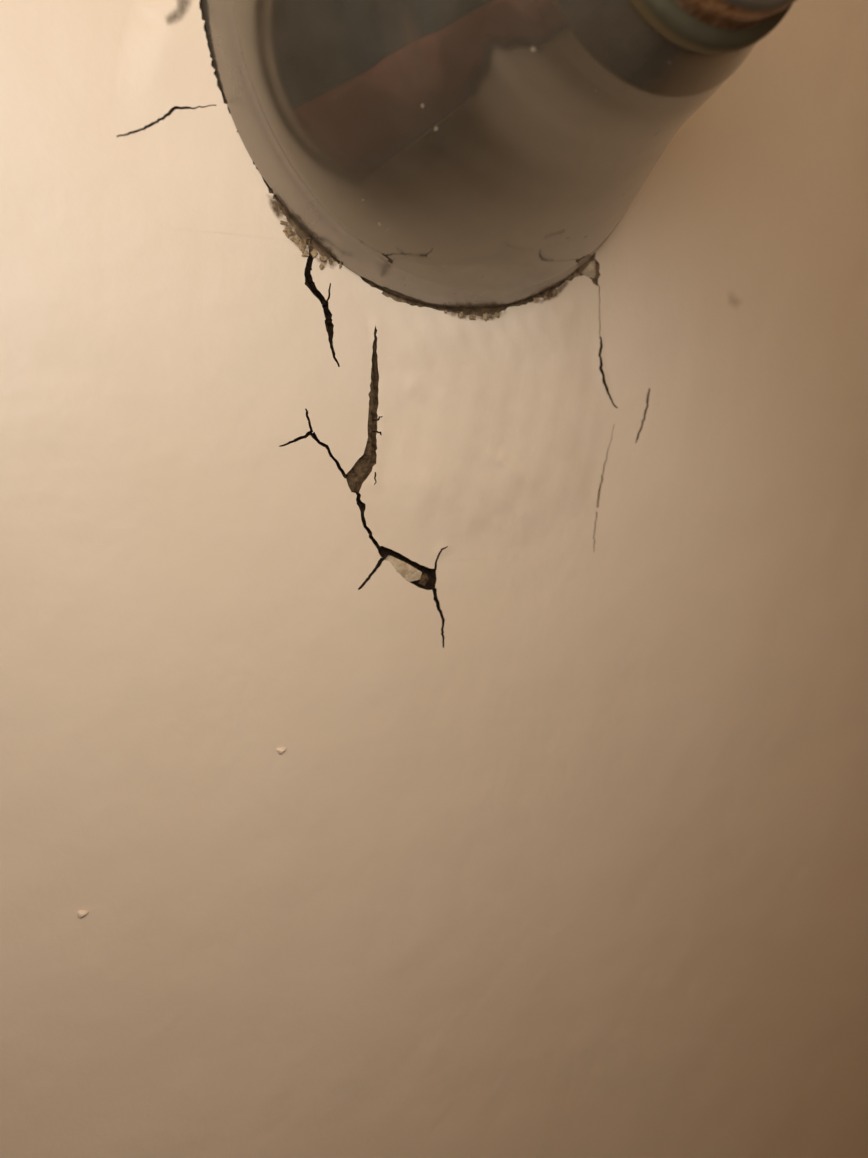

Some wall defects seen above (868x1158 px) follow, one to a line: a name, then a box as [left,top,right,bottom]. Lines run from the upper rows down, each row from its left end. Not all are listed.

crack [117,105,217,137]
crack [304,239,340,367]
crack [279,325,448,648]
crack [593,285,650,552]